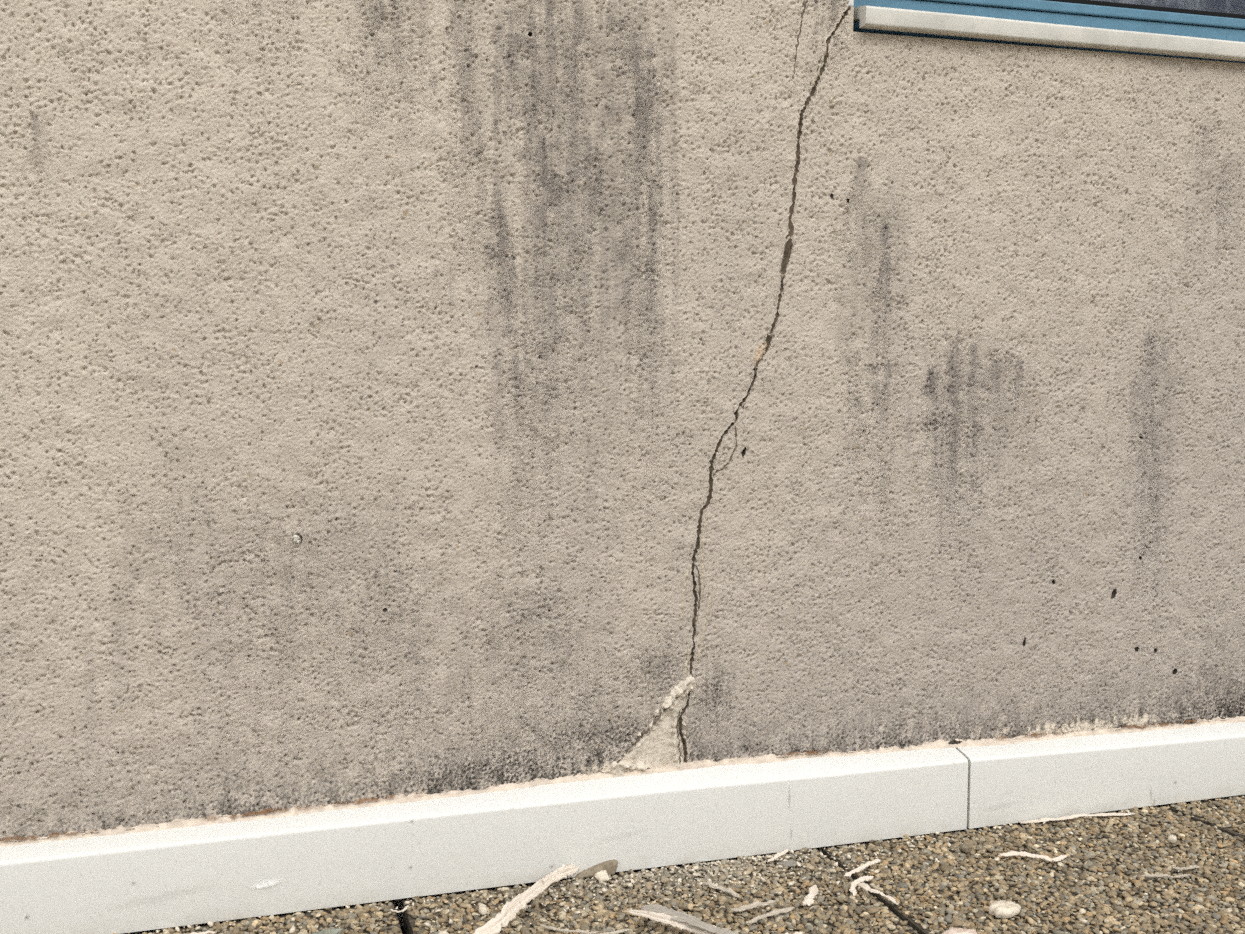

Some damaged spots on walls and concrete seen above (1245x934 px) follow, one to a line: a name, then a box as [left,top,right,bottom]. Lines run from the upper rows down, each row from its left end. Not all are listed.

crack [617,0,851,763]
damp [187,725,647,818]
damp [689,720,1055,762]
damp [1159,681,1245,724]